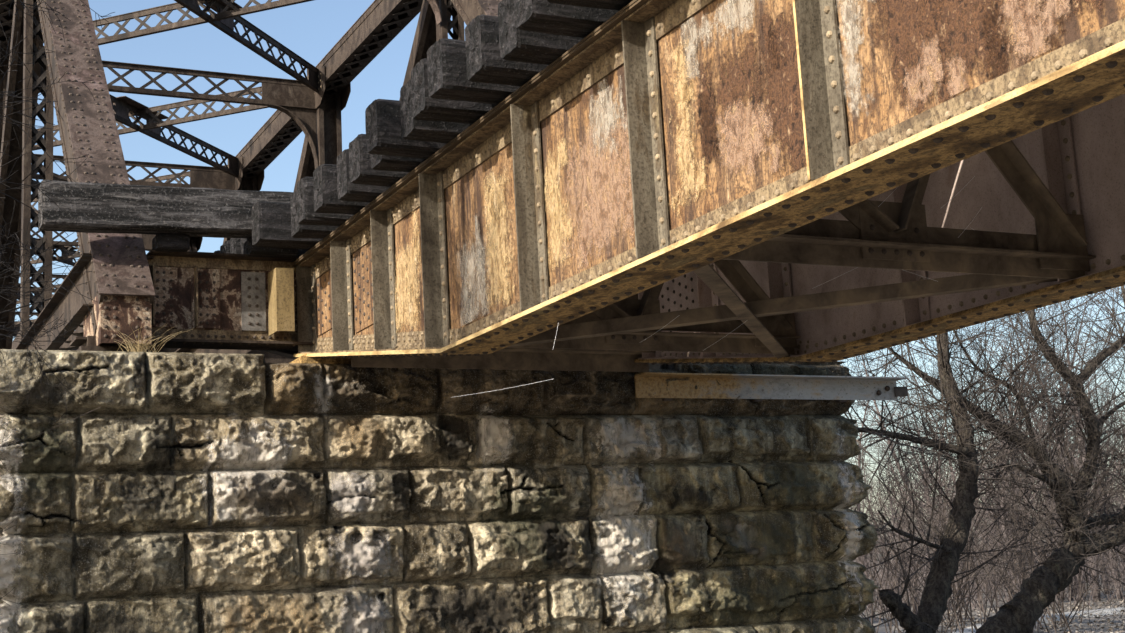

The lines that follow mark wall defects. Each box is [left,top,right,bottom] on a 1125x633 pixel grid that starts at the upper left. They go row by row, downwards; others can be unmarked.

rust [868,0,1103,113]
rust [696,6,807,177]
crack [500,476,563,494]
crack [728,461,773,505]
crack [9,511,81,526]